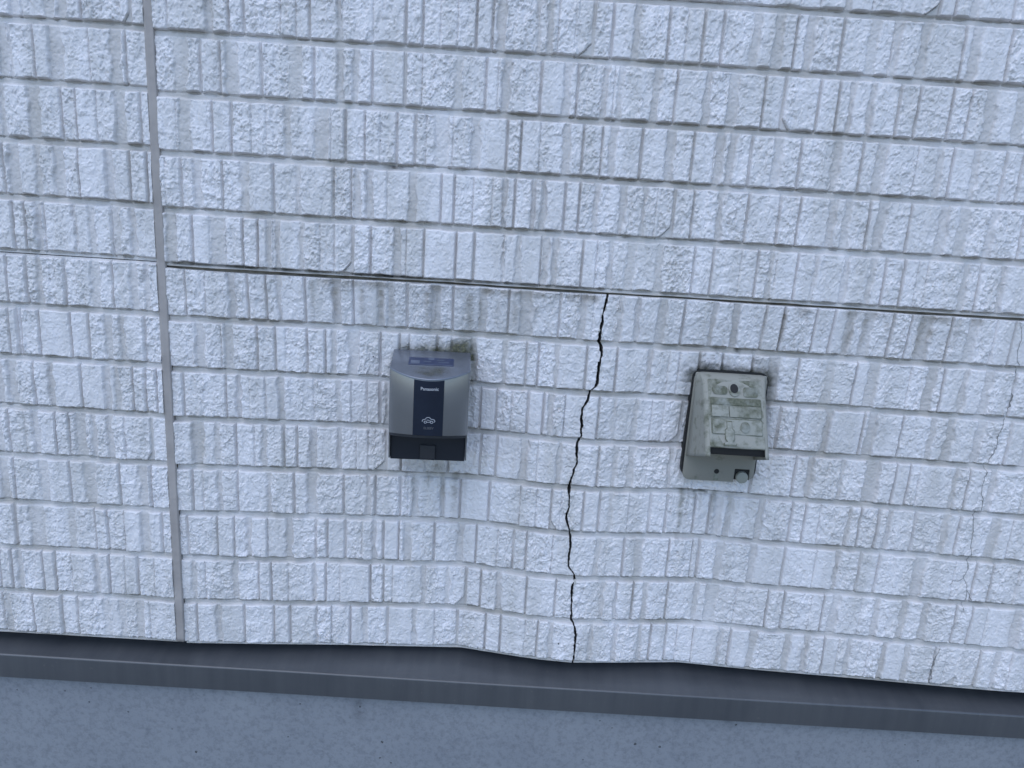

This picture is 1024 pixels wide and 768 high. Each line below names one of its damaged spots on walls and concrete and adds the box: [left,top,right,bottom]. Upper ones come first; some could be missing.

crack [564,294,609,660]